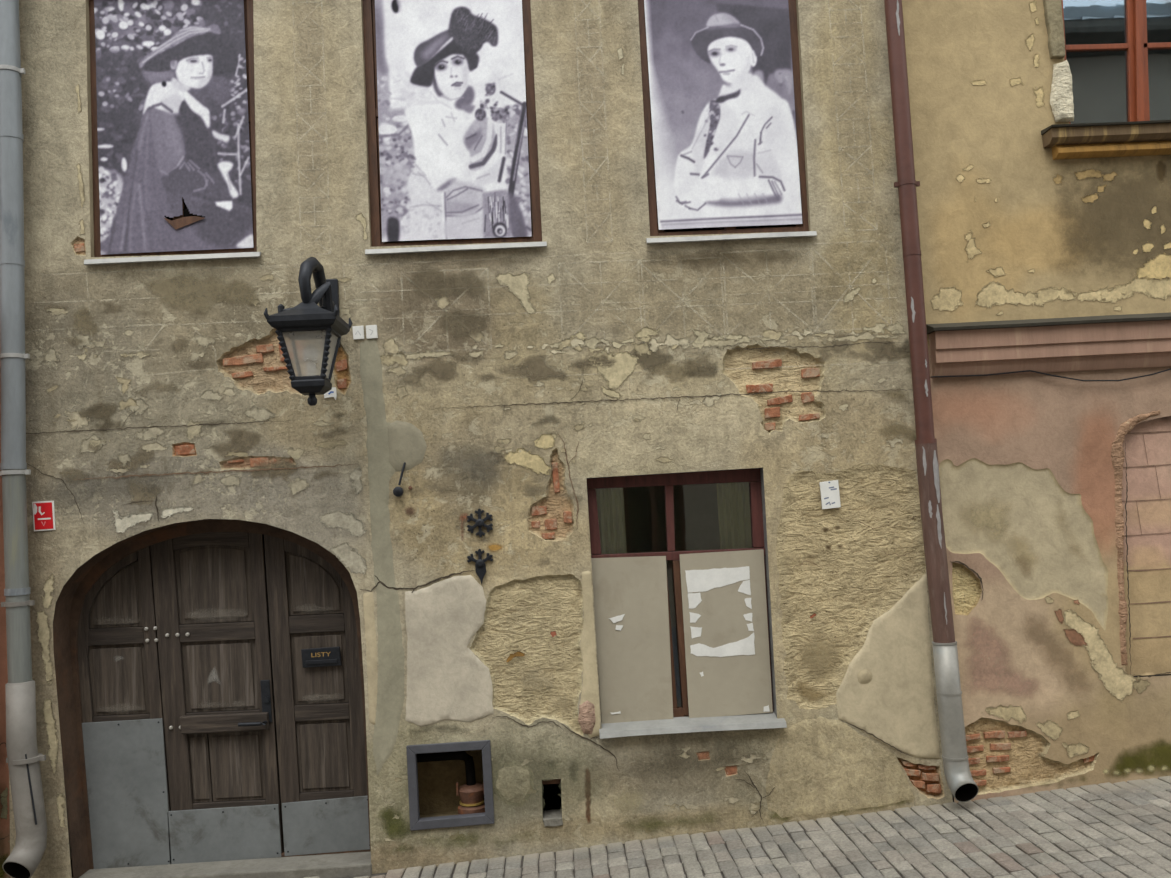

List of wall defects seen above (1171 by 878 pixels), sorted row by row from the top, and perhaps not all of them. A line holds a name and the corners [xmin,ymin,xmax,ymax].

peeling [931,206,1171,315]
spalling [173,329,347,495]
spalling [379,296,916,447]
peeling [112,506,193,533]
peeling [319,510,368,575]
crack [360,570,476,593]
spalling [491,432,582,542]
spalling [776,424,1141,710]
spalling [470,560,584,736]
crack [492,716,620,771]
spalling [897,757,945,799]
spalling [965,704,1099,795]